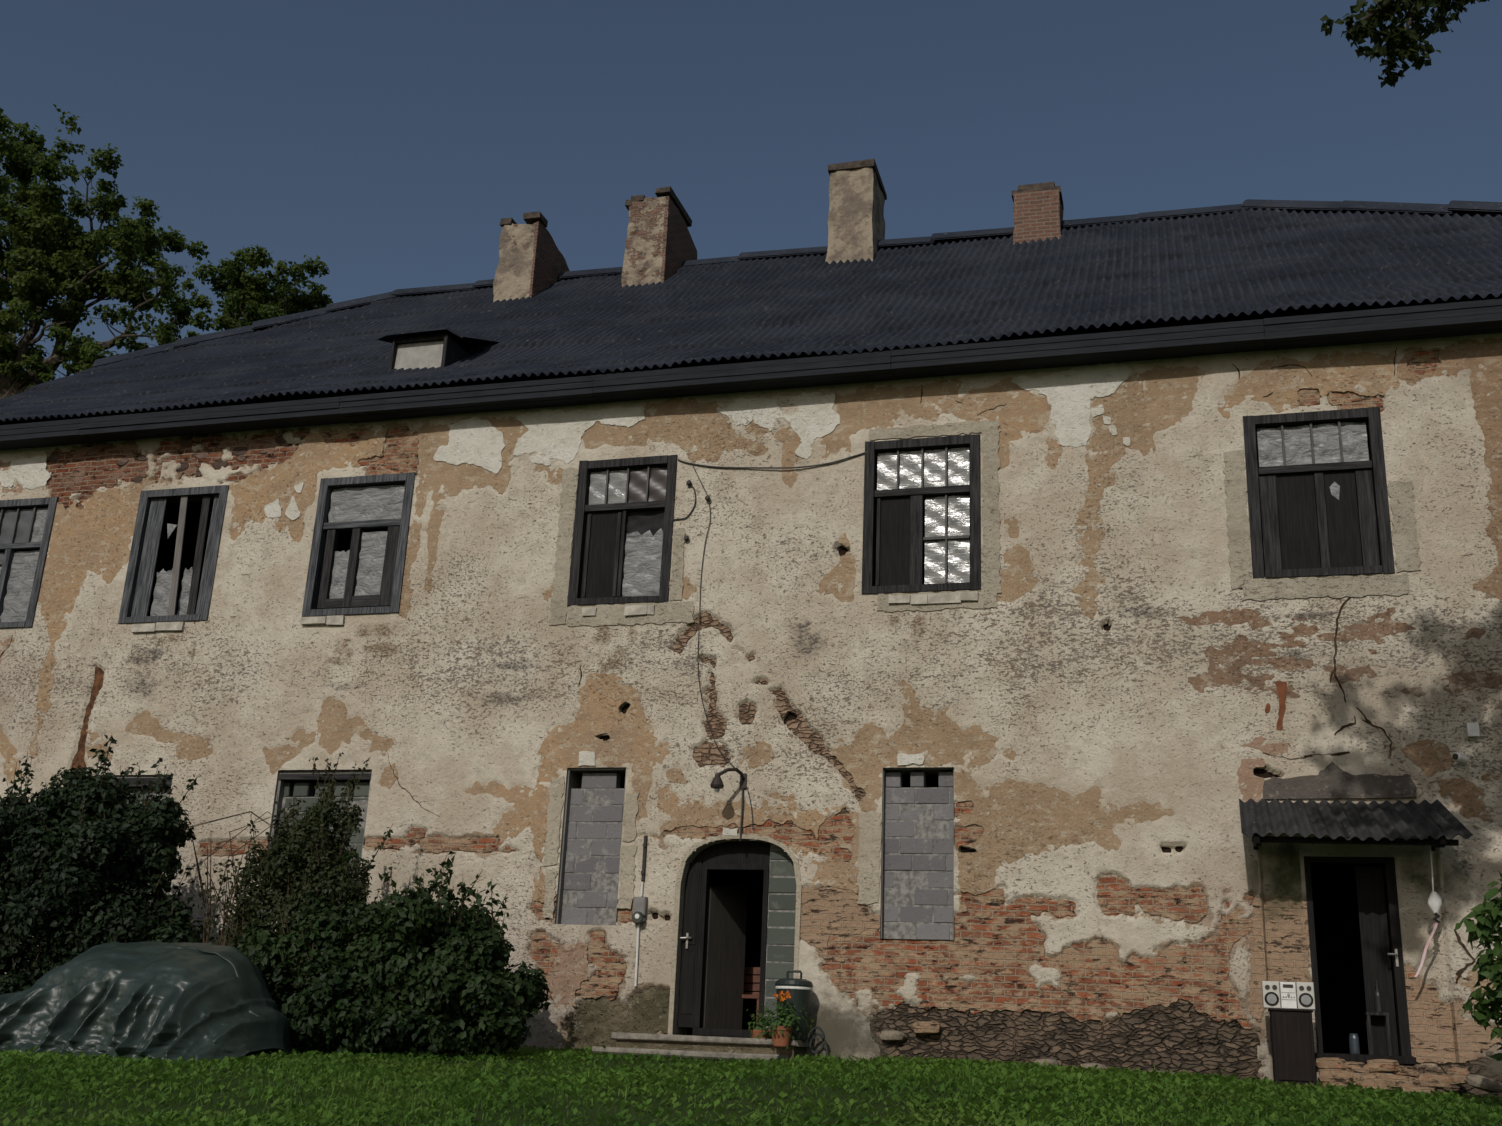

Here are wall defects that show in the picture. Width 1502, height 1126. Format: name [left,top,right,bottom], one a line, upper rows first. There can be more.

flaking render [581,398,802,488]
flaking render [820,378,1063,470]
flaking render [1071,365,1206,631]
flaking render [1217,337,1502,600]
rust [71,666,105,777]
flaking render [0,416,529,789]
flaking render [672,613,733,653]
flaking render [818,533,856,602]
flaking render [997,519,1038,602]
flaking render [1178,607,1416,698]
crack [1263,597,1392,760]
flaking render [365,657,1310,1080]